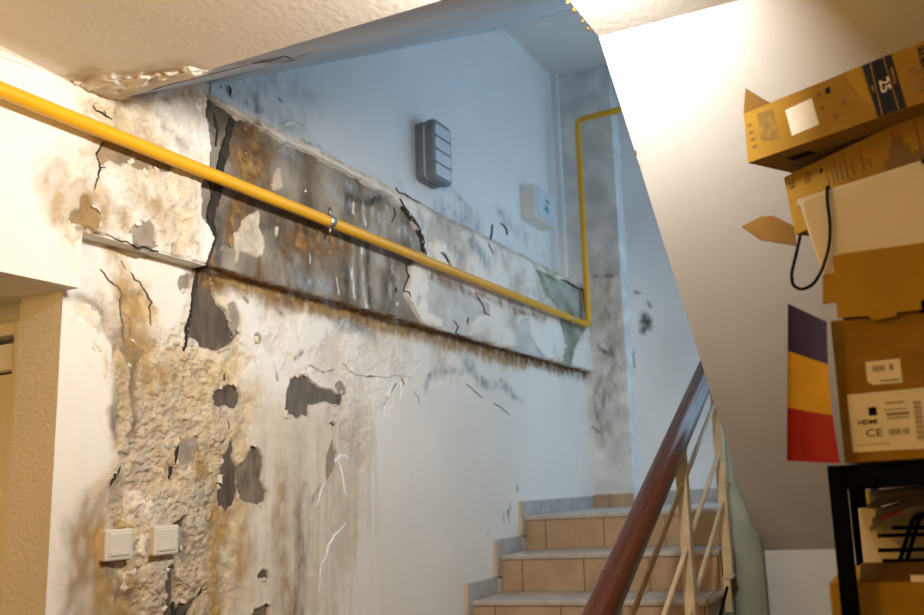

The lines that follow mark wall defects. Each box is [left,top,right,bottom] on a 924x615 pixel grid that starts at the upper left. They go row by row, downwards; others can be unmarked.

peeling [73,66,215,100]
crack [94,141,106,190]
crack [153,56,292,351]
spalling [201,100,421,325]
crack [100,234,159,344]
spalling [178,275,241,354]
peeling [428,277,489,336]
spalling [536,270,585,367]
spalling [212,382,238,408]
spalling [284,371,346,419]
spalling [216,441,265,511]
crack [170,582,208,615]